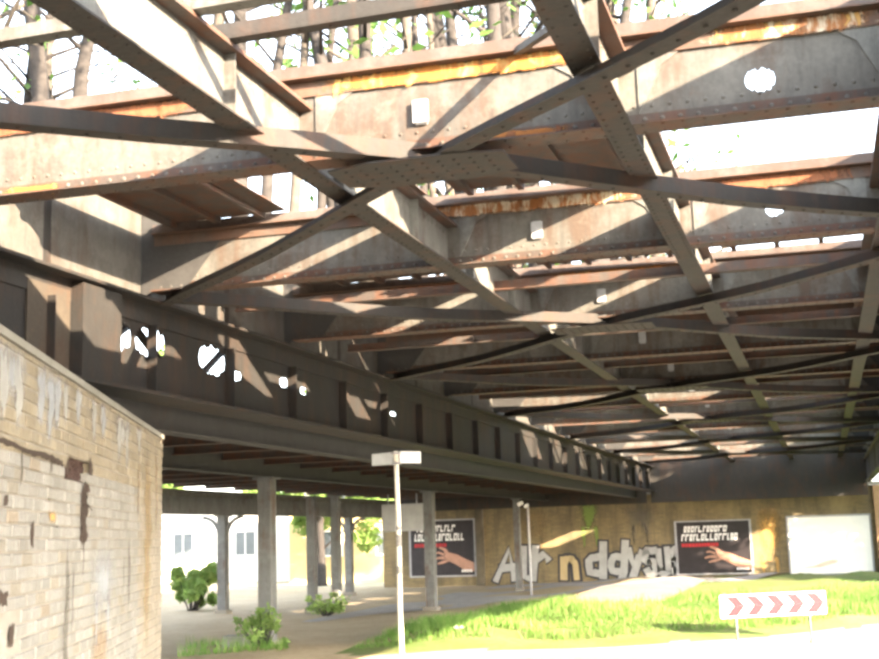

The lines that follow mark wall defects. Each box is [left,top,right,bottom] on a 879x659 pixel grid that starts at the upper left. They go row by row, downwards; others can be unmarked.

corrosion [705,10,878,44]
corrosion [328,50,565,96]
corrosion [494,125,564,138]
corrosion [5,183,56,200]
corrosion [438,191,640,217]
water stain [0,348,23,417]
water stain [38,372,82,435]